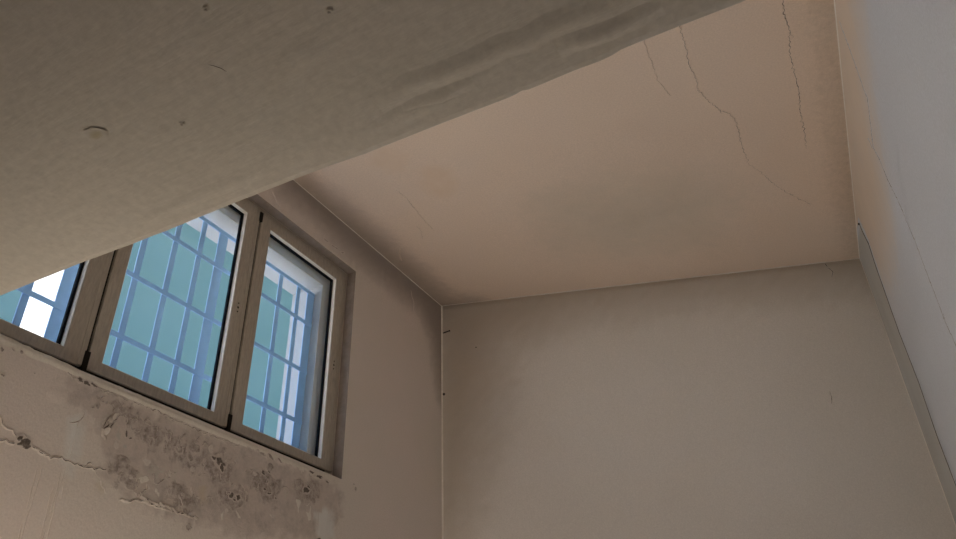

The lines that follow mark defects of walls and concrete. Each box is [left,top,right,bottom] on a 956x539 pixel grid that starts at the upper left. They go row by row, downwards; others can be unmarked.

crack [678,26,811,205]
crack [781,0,807,146]
crack [0,416,112,494]
water stain [50,400,96,489]